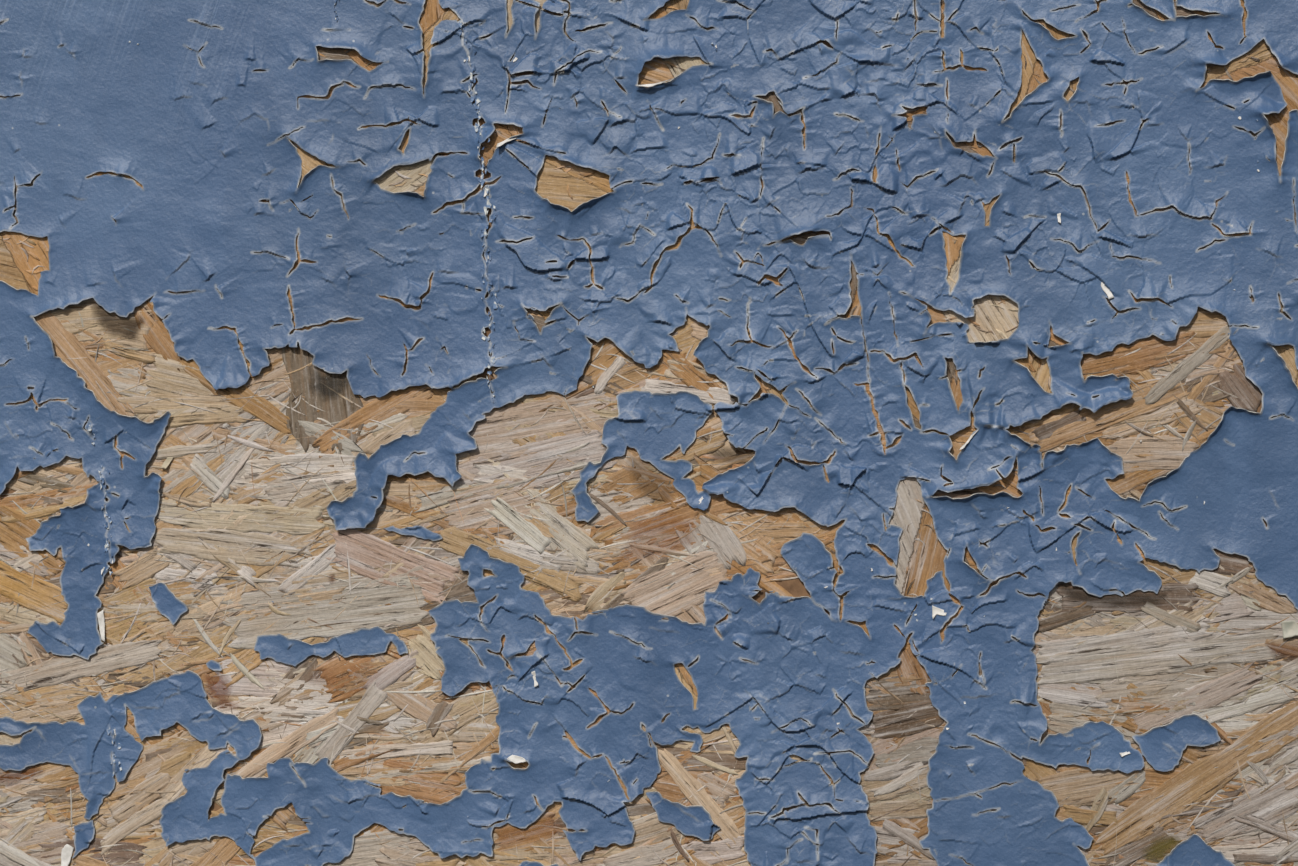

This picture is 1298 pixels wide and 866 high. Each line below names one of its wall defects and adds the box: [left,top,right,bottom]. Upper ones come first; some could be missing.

crack [81,168,149,197]
crack [203,322,258,380]
crack [282,0,608,402]
peeling [471,115,625,222]
crack [566,164,992,489]
crack [909,0,994,79]
peeling [864,0,1089,193]
peeling [880,185,1298,618]
crack [995,131,1298,328]
peeling [1189,29,1298,192]
peeling [0,222,993,866]
peeling [1012,528,1298,866]